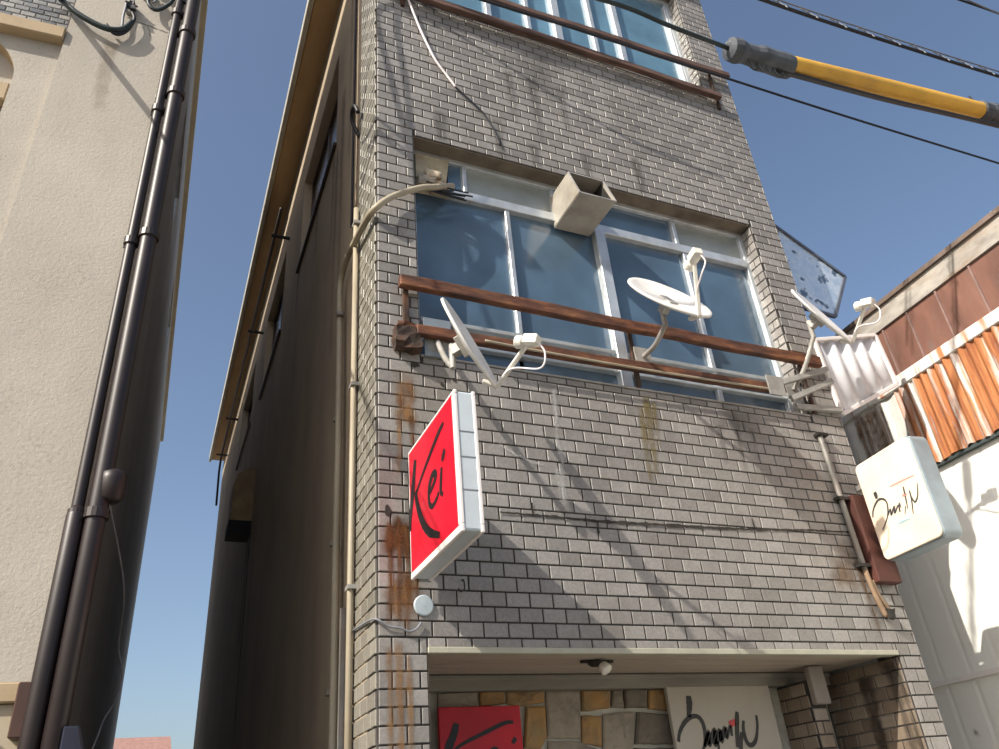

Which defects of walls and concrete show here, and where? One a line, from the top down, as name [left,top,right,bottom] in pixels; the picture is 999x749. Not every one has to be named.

rust [397,383,414,444]
rust [856,410,889,456]
rust [893,324,999,462]
rust [385,517,418,624]